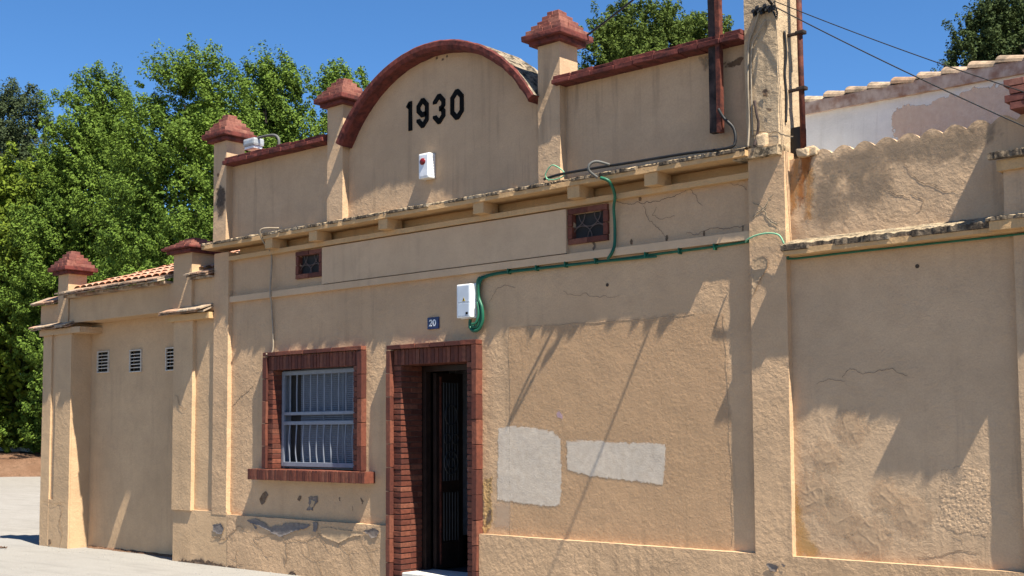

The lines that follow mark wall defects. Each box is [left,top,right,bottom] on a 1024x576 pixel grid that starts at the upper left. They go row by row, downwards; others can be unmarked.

peeling [892,83,1021,140]
crack [616,183,778,237]
corrosion [790,156,813,219]
crack [817,367,907,384]
spalling [247,496,379,543]